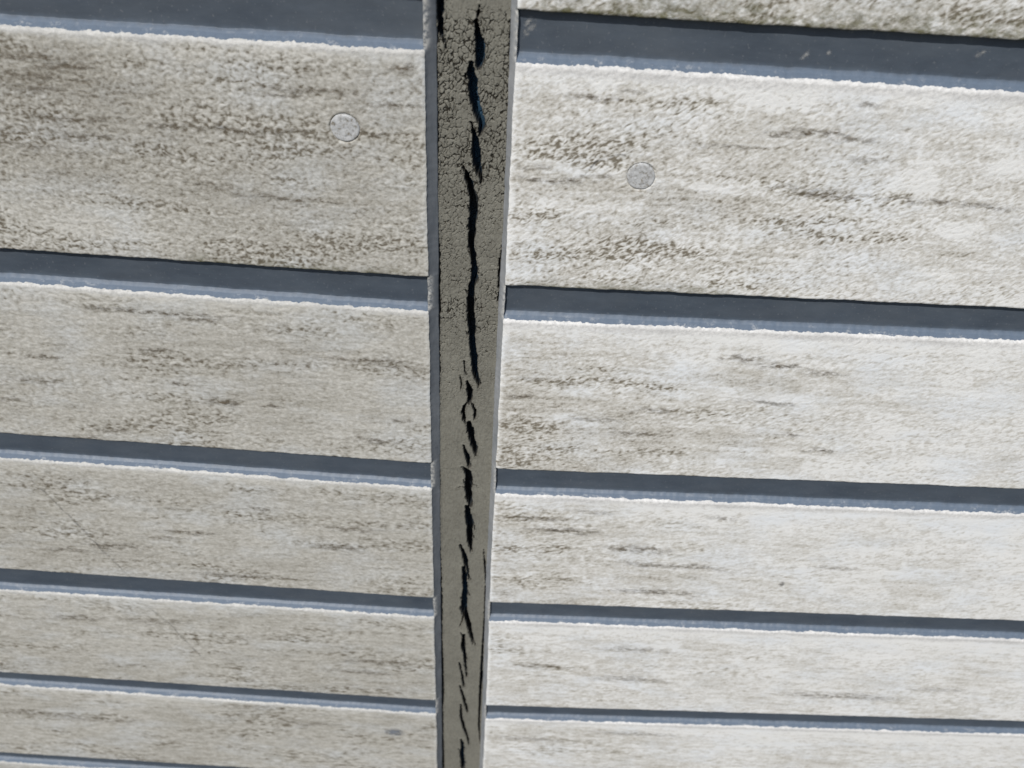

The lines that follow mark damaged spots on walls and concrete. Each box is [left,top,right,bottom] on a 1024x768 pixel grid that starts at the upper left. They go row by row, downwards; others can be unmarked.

crack [437,0,511,768]